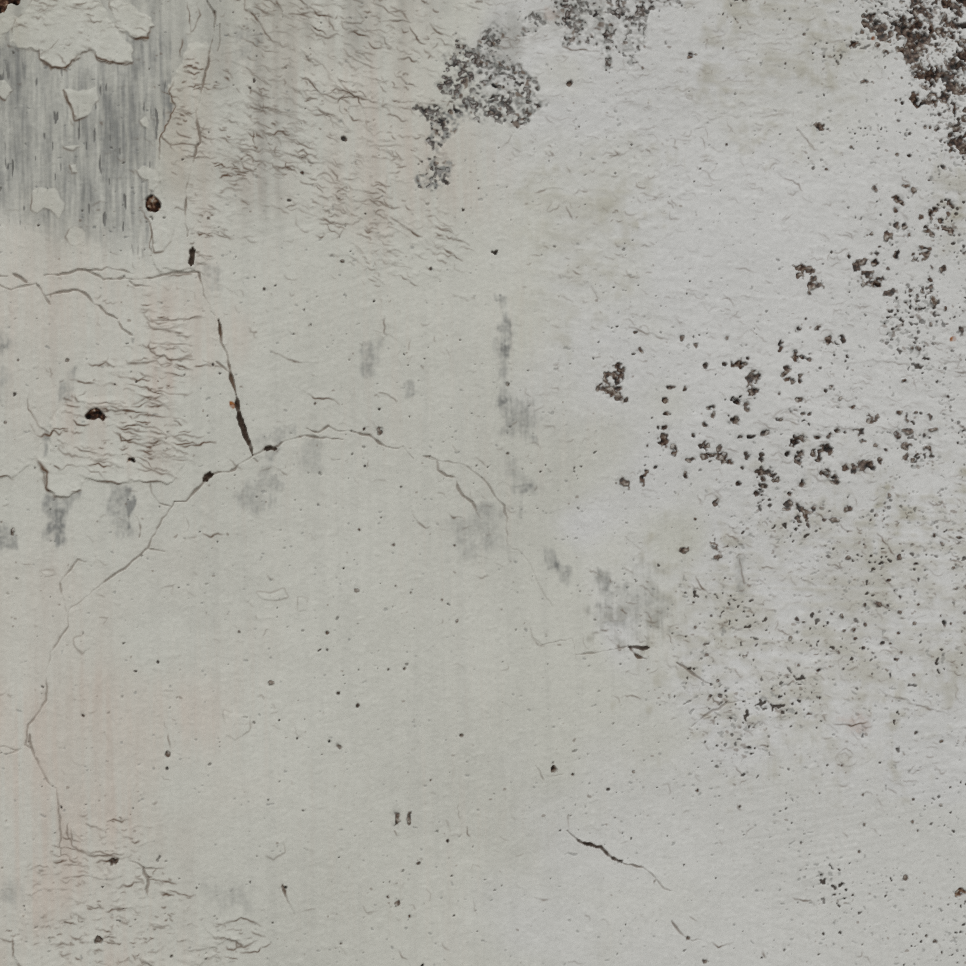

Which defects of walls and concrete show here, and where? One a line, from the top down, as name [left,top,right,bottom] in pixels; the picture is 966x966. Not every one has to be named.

flaking render [520,0,688,74]
flaking render [849,0,966,163]
peeling [0,0,552,274]
flaking render [847,184,965,336]
flaking render [596,363,629,405]
flaking render [778,340,812,396]
crack [0,0,554,858]
flaking render [647,357,781,508]
flaking render [784,413,888,486]
flaking render [894,410,939,463]
flaking render [782,480,853,531]
crack [567,814,673,893]